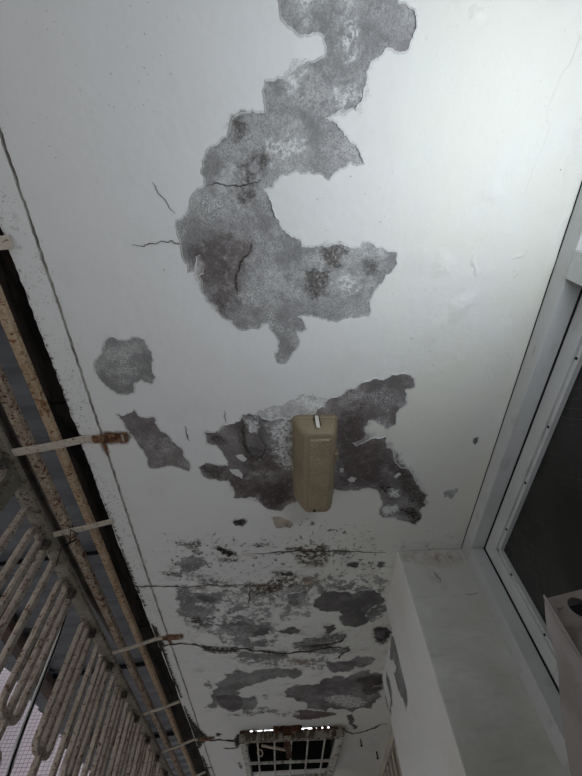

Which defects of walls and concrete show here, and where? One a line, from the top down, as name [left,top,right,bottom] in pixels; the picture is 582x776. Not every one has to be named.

spalling [174,0,418,364]
spalling [93,335,157,396]
spalling [115,372,428,529]
damp [162,522,383,596]
crack [255,548,386,556]
crack [164,634,350,659]
spalling [203,589,408,730]